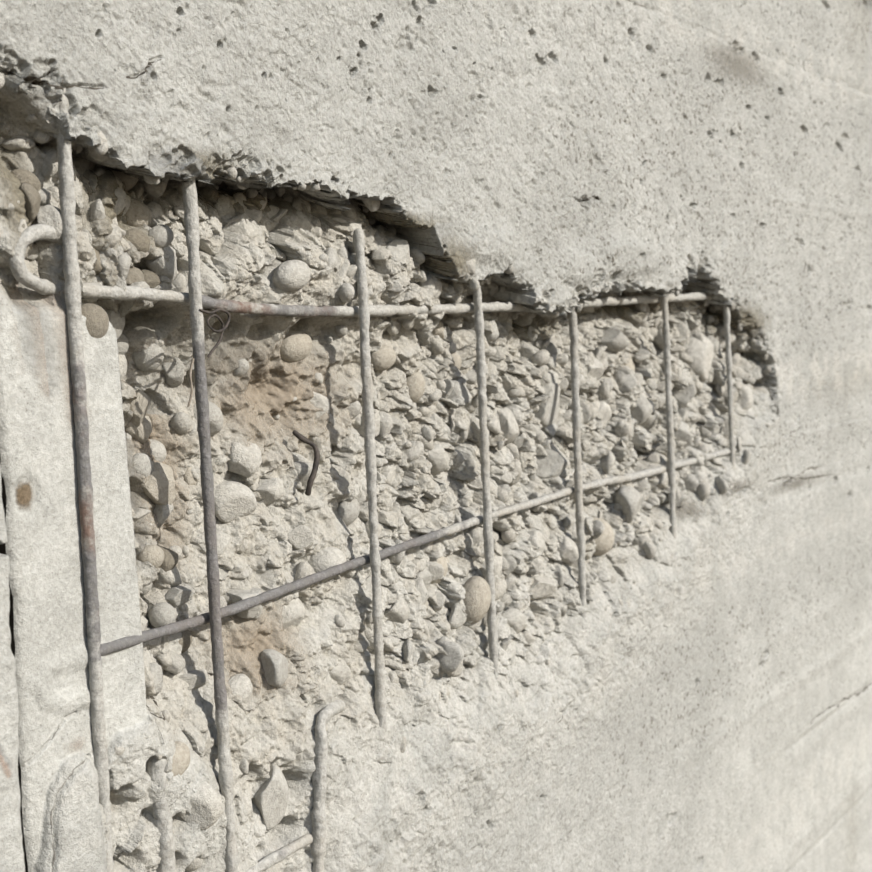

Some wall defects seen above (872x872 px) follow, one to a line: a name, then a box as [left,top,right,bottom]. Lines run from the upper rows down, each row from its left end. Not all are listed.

hole [370,12,385,31]
hole [411,0,439,26]
hole [627,26,640,42]
hole [728,37,763,62]
hole [337,55,359,78]
hole [533,50,566,73]
hole [427,84,440,99]
hole [705,70,728,90]
hole [824,122,852,154]
spalling [0,65,227,872]
corrosion [16,483,32,506]
spalling [195,165,779,872]